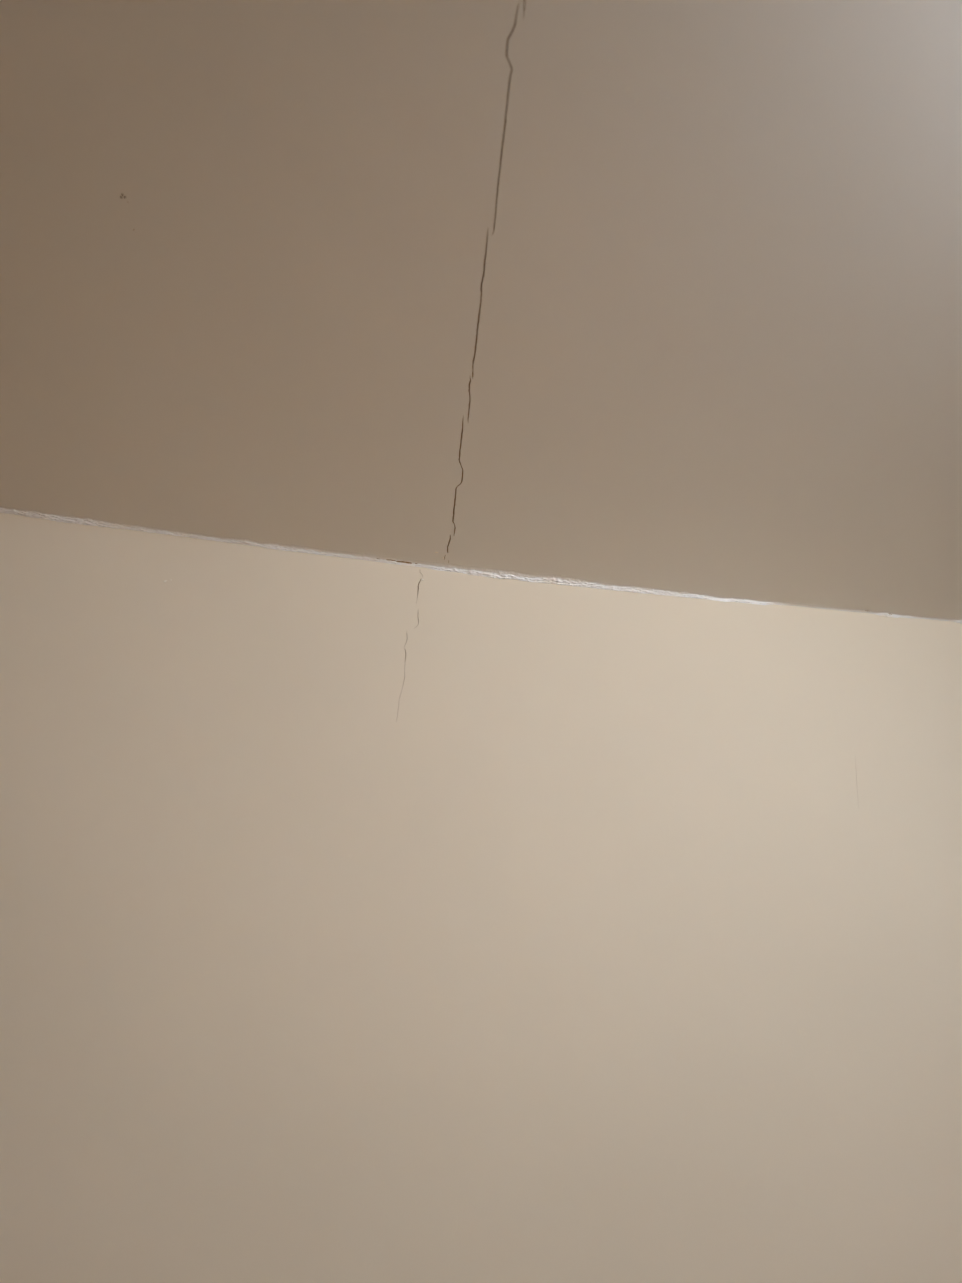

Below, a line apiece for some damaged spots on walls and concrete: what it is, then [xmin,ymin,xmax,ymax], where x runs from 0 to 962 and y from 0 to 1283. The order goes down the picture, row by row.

crack [397,0,525,716]